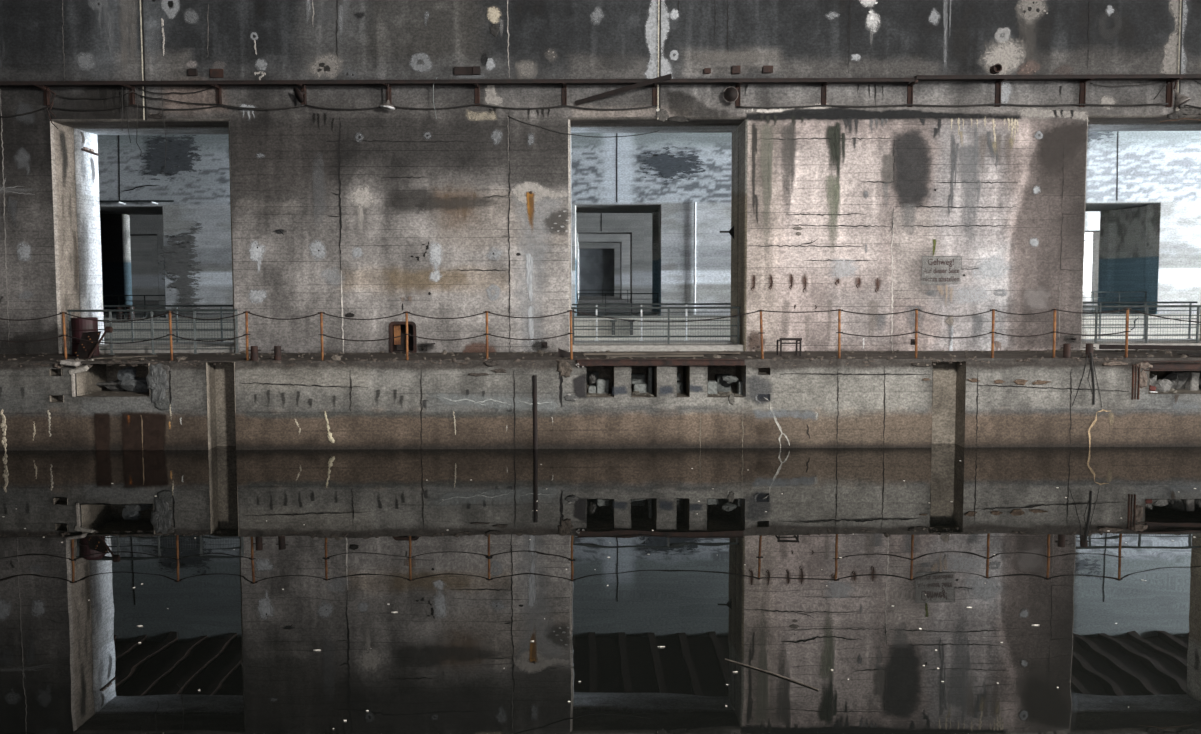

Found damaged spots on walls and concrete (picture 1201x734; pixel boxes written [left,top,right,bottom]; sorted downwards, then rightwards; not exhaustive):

leakage [645,0,728,118]
leakage [1161,0,1188,74]
corrosion [516,183,543,221]
leakage [826,118,887,234]
leakage [882,119,959,214]